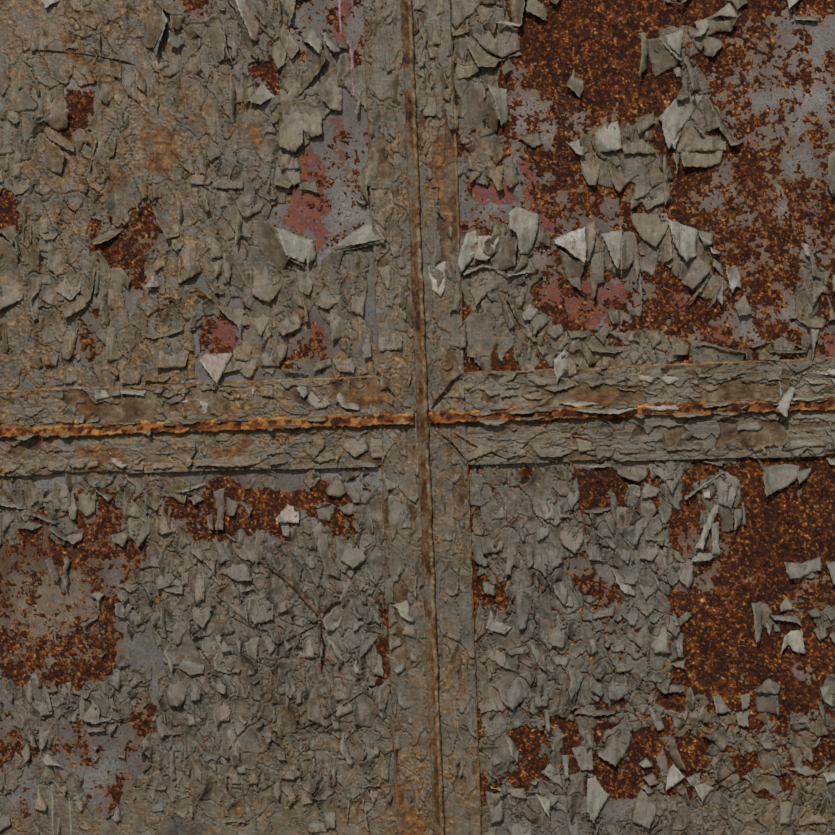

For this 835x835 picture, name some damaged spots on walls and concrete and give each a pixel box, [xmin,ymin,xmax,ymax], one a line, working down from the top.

corrosion [272,123,370,247]
corrosion [428,0,835,373]
corrosion [74,446,128,476]
peeling [0,0,433,835]
corrosion [151,476,359,559]
peeling [412,0,835,835]
corrosion [0,480,173,700]
corrosion [370,589,391,695]
corrosion [472,552,516,653]
corrosion [480,455,835,806]
corrosion [0,687,163,822]
corrosion [477,681,487,752]